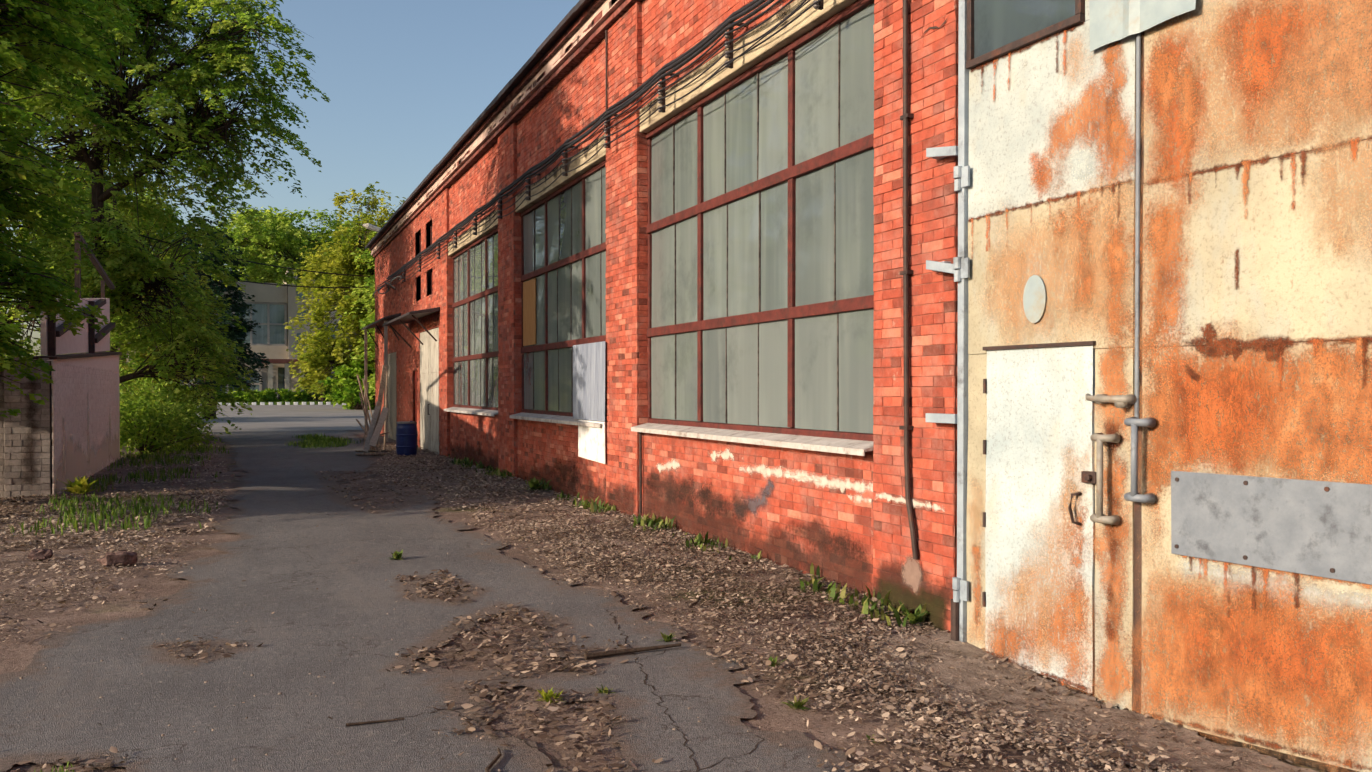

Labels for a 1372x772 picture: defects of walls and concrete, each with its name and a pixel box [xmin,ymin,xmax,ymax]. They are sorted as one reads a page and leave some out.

rust [968,0,1372,769]
leakage [517,460,950,631]
leakage [710,449,944,512]